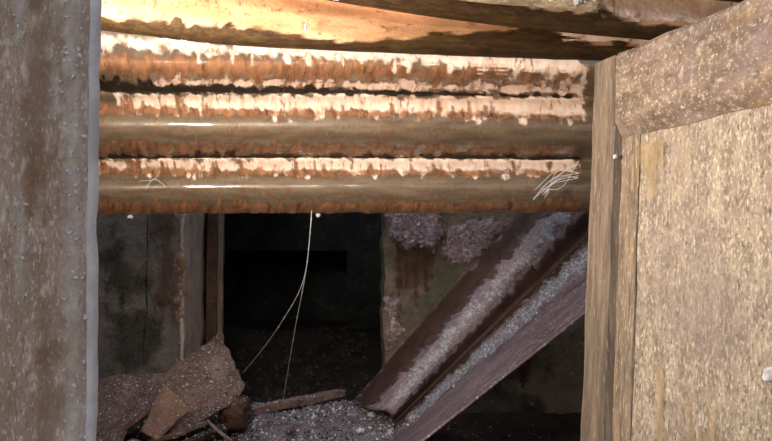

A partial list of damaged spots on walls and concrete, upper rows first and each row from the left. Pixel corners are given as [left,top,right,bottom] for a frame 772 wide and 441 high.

corrosion [99,51,577,92]
corrosion [99,94,581,121]
crack [131,214,159,354]
corrosion [97,198,580,343]